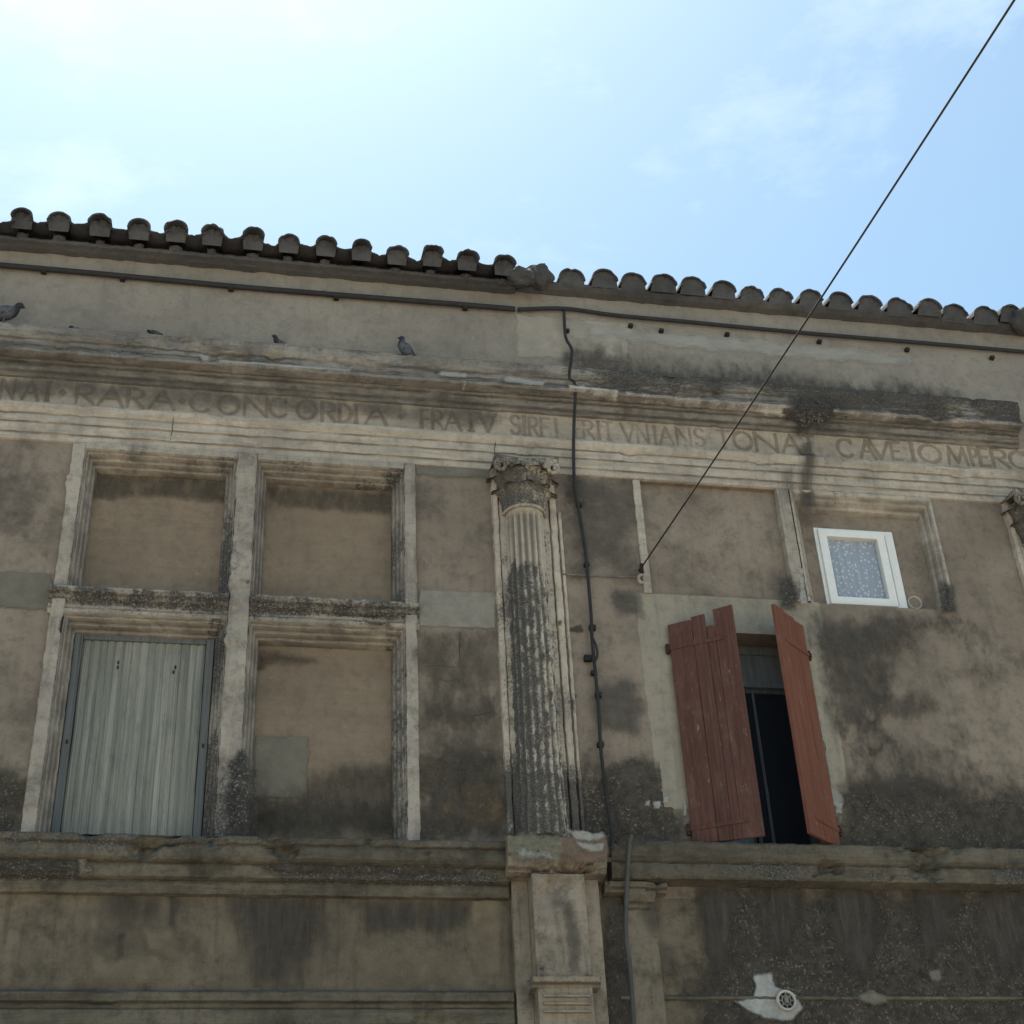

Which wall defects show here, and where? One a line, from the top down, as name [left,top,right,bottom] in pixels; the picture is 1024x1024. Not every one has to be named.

damp [564,349,818,386]
damp [816,616,1024,849]
damp [0,770,26,832]
damp [250,768,392,837]
damp [567,759,685,842]